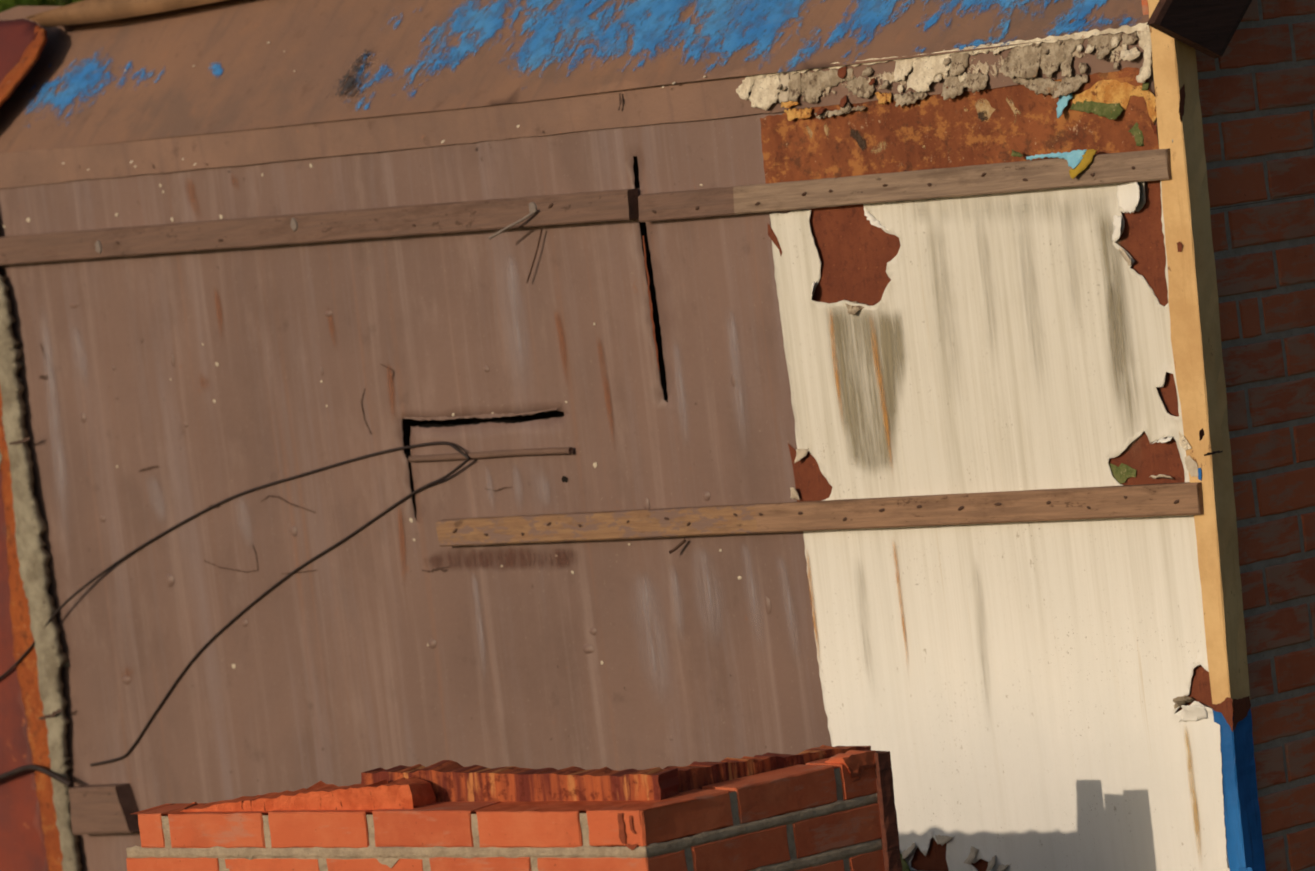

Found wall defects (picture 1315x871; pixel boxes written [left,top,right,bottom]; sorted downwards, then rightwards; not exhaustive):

crack [632,156,640,188]
peeling [348,0,1157,146]
corrosion [760,67,1159,184]
crack [639,221,668,402]
peeling [810,204,901,315]
peeling [1112,180,1183,306]
crack [361,364,394,435]
crack [403,408,564,520]
damp [832,314,903,466]
peeling [1109,373,1205,485]
corrosion [0,390,63,871]
peeling [1173,665,1252,871]